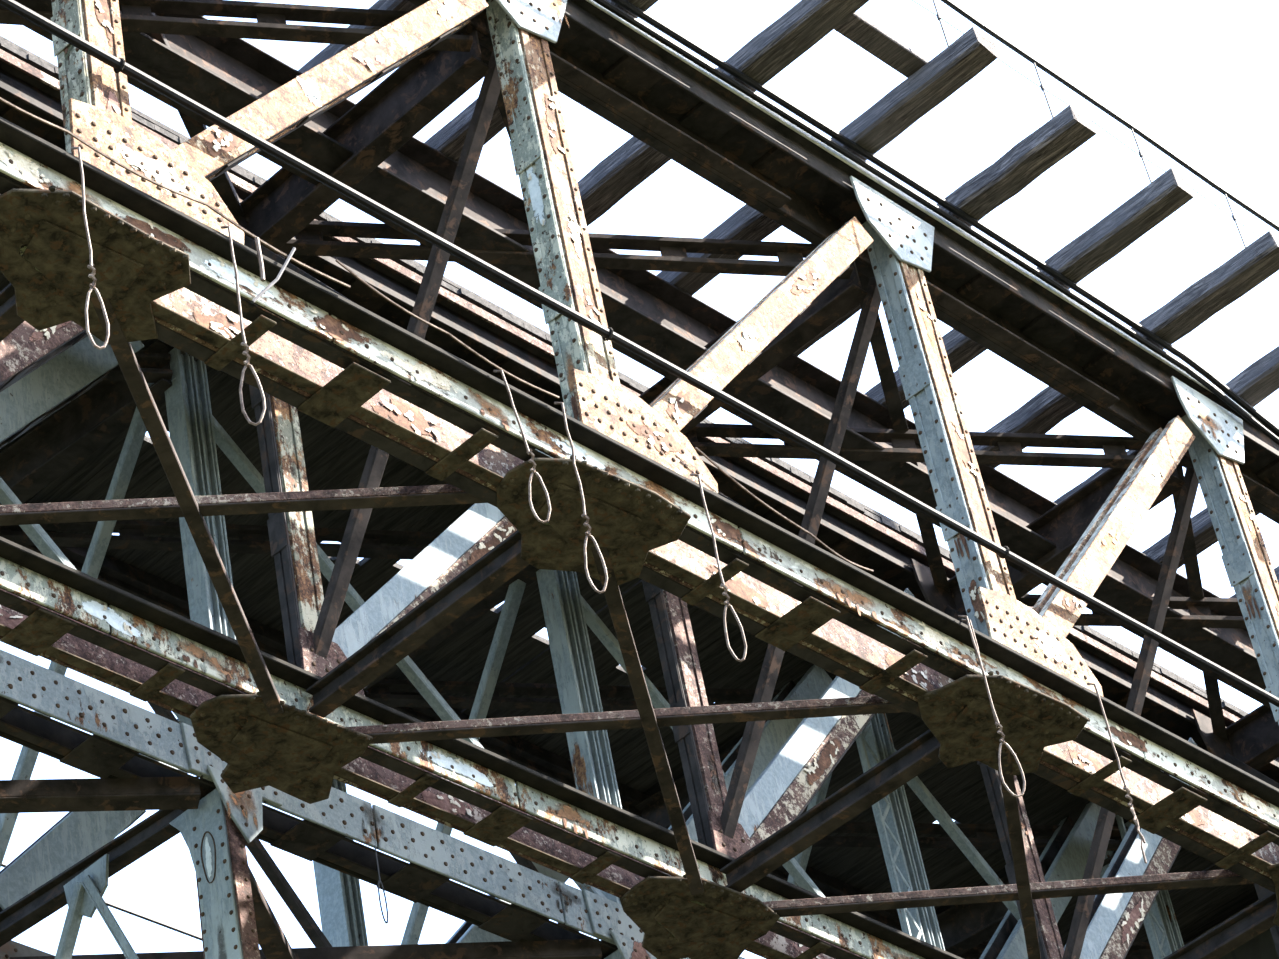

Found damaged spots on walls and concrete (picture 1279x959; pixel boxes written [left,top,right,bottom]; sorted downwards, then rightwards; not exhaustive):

corrosion [203,127,243,157]
peeling [116,145,187,192]
corrosion [566,353,578,420]
peeling [550,435,606,470]
corrosion [0,605,26,629]
corrosion [969,579,984,623]
corrosion [1062,583,1085,615]
corrosion [178,641,233,684]
corrosion [885,653,936,691]
peeling [1034,630,1071,664]
corrosion [420,790,473,816]
corrosion [548,804,590,839]